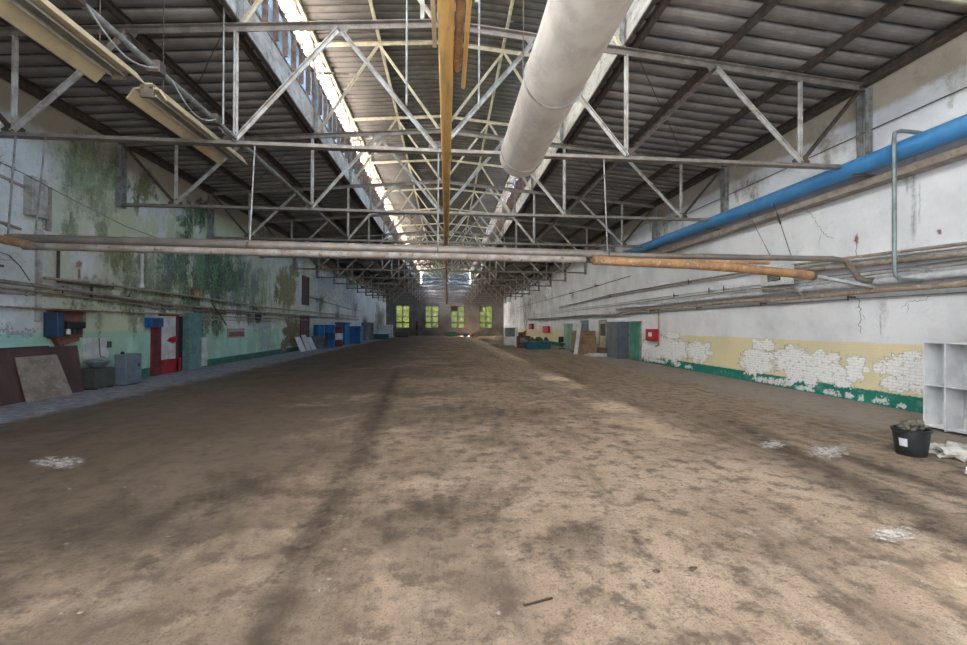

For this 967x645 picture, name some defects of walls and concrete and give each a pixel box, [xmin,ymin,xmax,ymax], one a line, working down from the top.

damp [128,171,158,212]
damp [178,198,216,239]
damp [73,252,266,337]
peeling [642,332,714,370]
peeling [738,338,923,409]